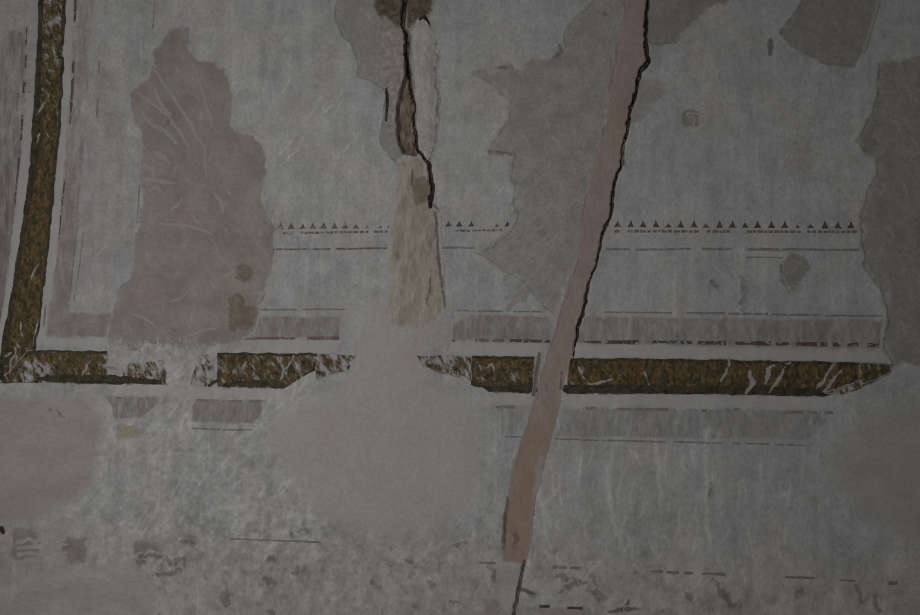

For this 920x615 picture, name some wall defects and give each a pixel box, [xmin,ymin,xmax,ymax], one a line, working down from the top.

peeling [106,25,277,362]
peeling [332,0,436,164]
crack [394,0,446,309]
peeling [468,0,624,320]
crack [571,0,651,363]
peeling [767,0,881,70]
peeling [852,51,920,370]
crack [512,560,538,615]